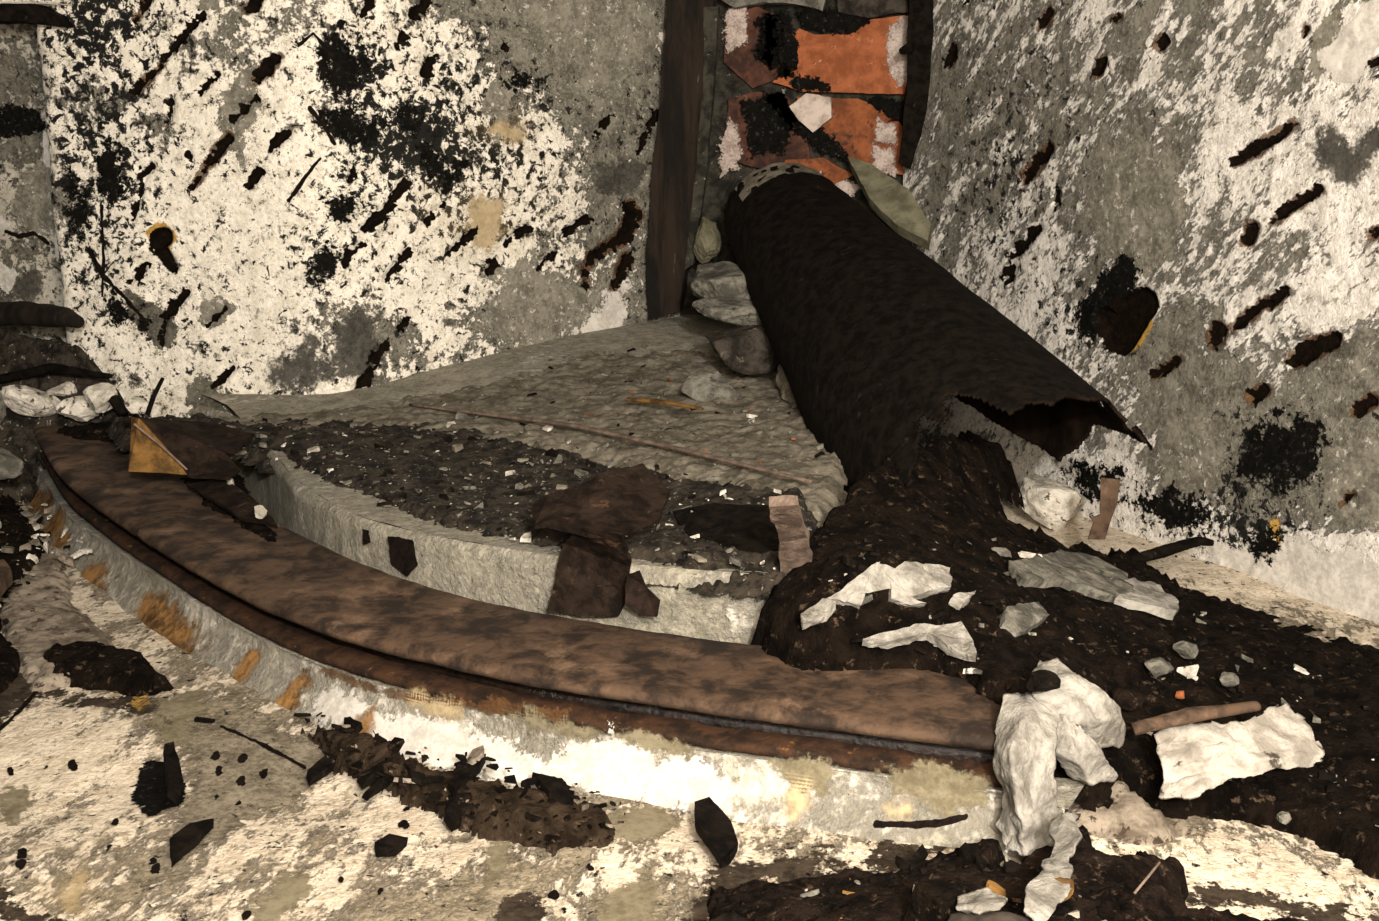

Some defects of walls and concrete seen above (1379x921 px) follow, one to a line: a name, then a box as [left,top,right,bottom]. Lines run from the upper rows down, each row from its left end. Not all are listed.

spalling [394,0,433,51]
spalling [419,53,439,79]
leakage [311,17,487,196]
spalling [789,93,833,133]
spalling [346,163,358,184]
flaking render [1071,133,1197,357]